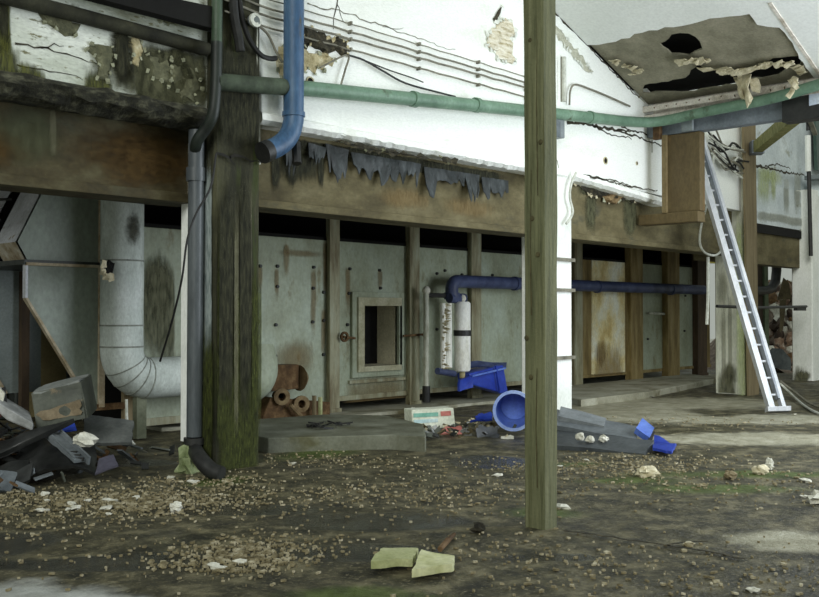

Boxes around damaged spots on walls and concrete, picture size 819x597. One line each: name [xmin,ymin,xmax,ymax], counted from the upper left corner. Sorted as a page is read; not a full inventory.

damp [0,4,45,78]
crack [15,42,97,80]
peeling [84,41,117,84]
spalling [304,25,350,81]
spalling [485,4,518,64]
peeling [608,59,644,76]
crack [567,121,662,147]
peeling [308,139,509,201]